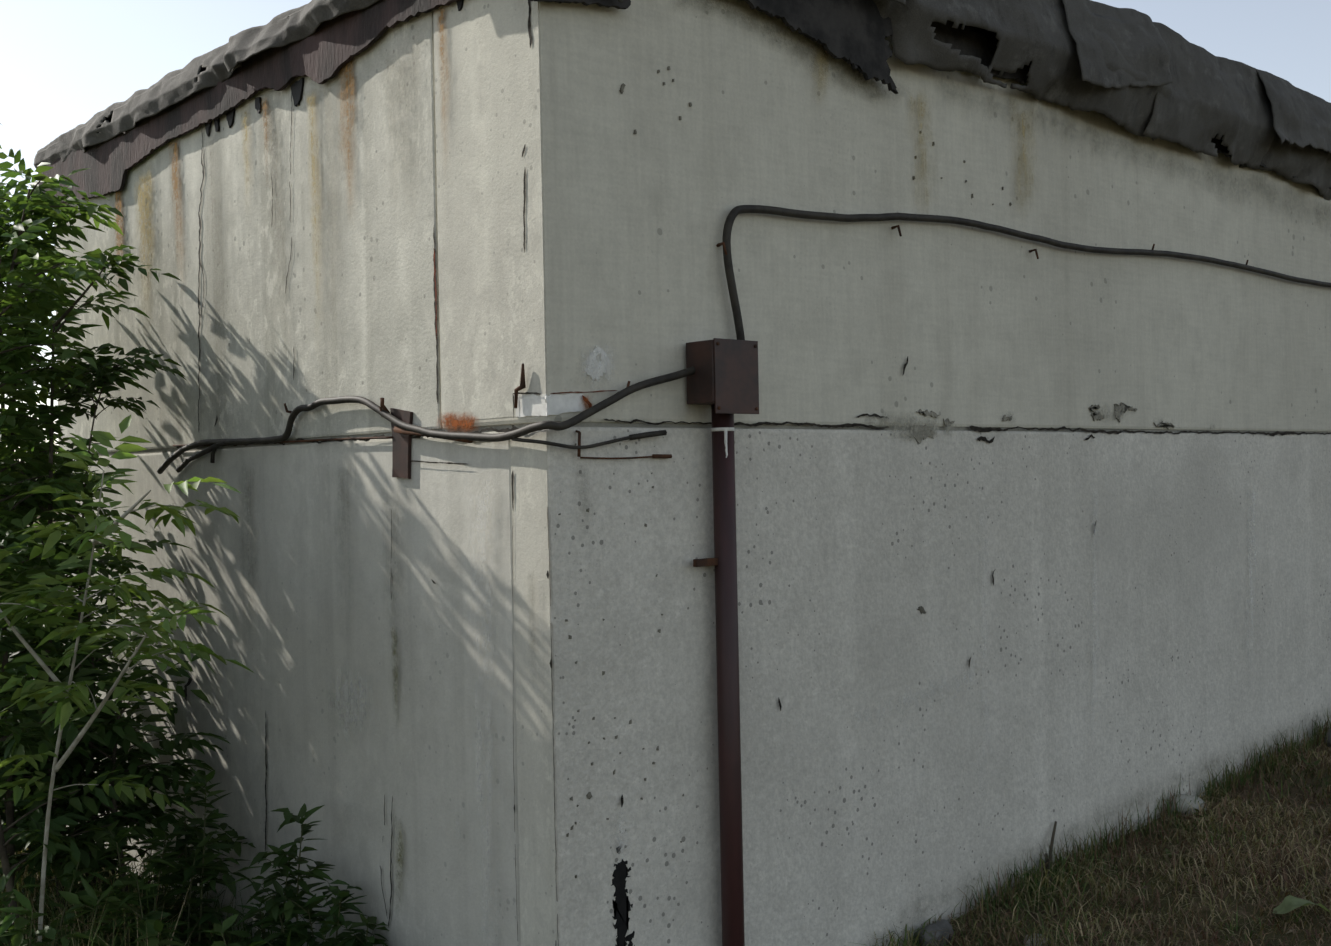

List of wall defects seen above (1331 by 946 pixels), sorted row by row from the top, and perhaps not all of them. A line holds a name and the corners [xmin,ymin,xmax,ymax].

crack [271,93,292,293]
crack [520,145,528,253]
crack [177,135,519,465]
rust [445,414,474,429]
peeling [515,394,547,417]
spalling [883,409,955,444]
spalling [1090,402,1137,423]
crack [388,509,396,600]
crack [508,471,516,597]
crack [262,711,270,852]
crack [511,723,519,940]
crack [546,507,559,946]